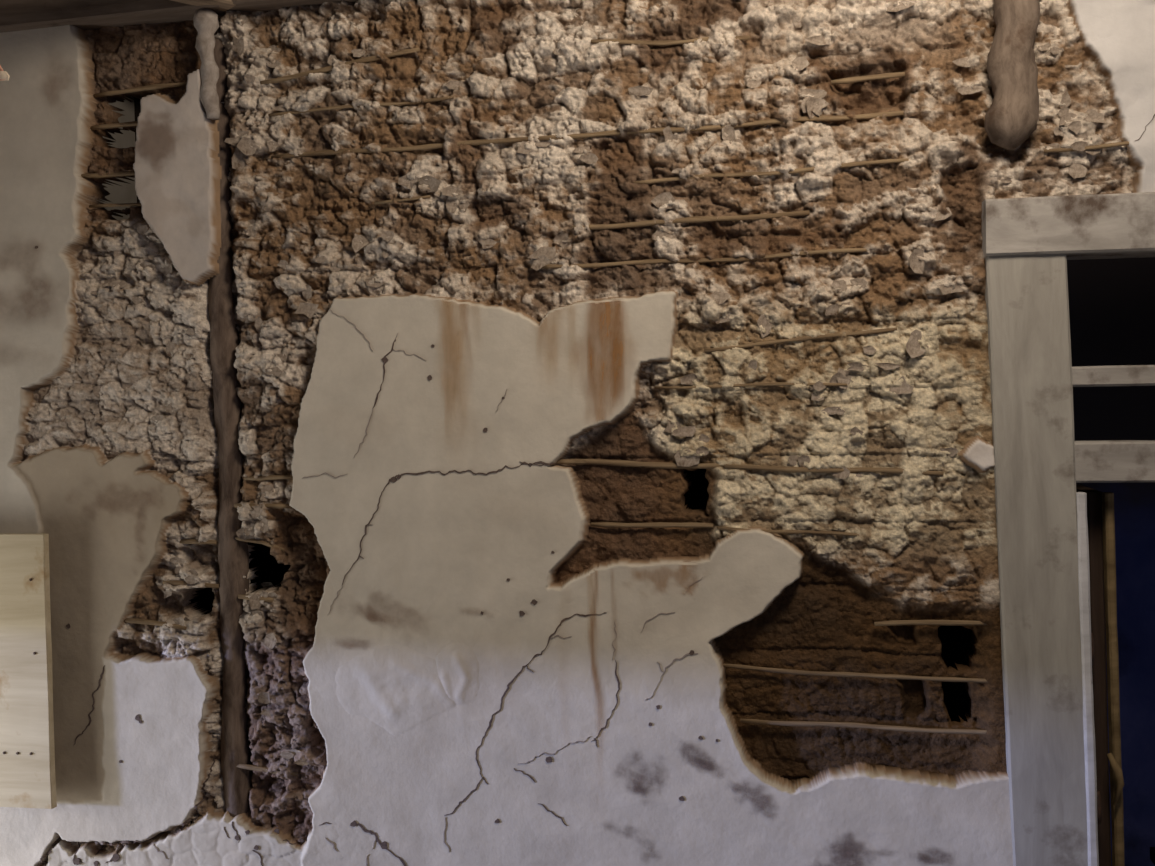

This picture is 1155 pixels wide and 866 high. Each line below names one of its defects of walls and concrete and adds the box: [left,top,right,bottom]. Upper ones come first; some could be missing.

spalling [21,20,226,834]
crack [302,309,435,479]
spalling [214,0,1136,846]
crack [328,461,556,614]
crack [444,578,702,852]
leakage [683,747,713,770]
spalling [94,842,126,853]